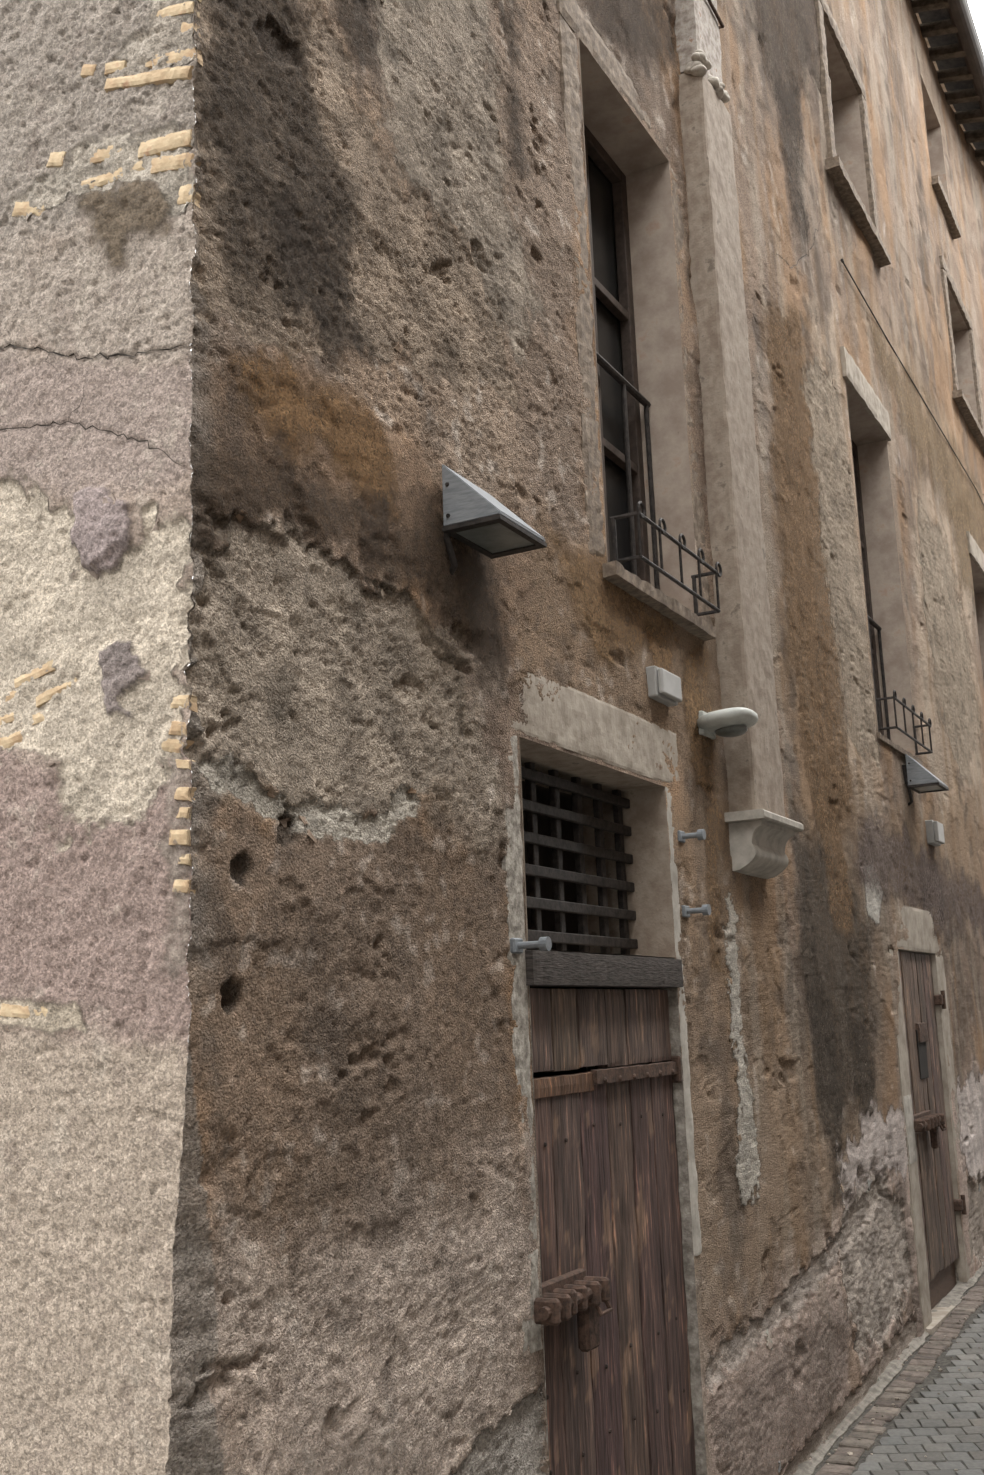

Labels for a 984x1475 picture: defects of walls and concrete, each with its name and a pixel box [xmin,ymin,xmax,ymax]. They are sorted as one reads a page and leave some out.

water stain [78,176,171,267]
spalling [12,0,545,409]
crack [0,344,190,470]
water stain [190,437,508,687]
spalling [0,476,465,974]